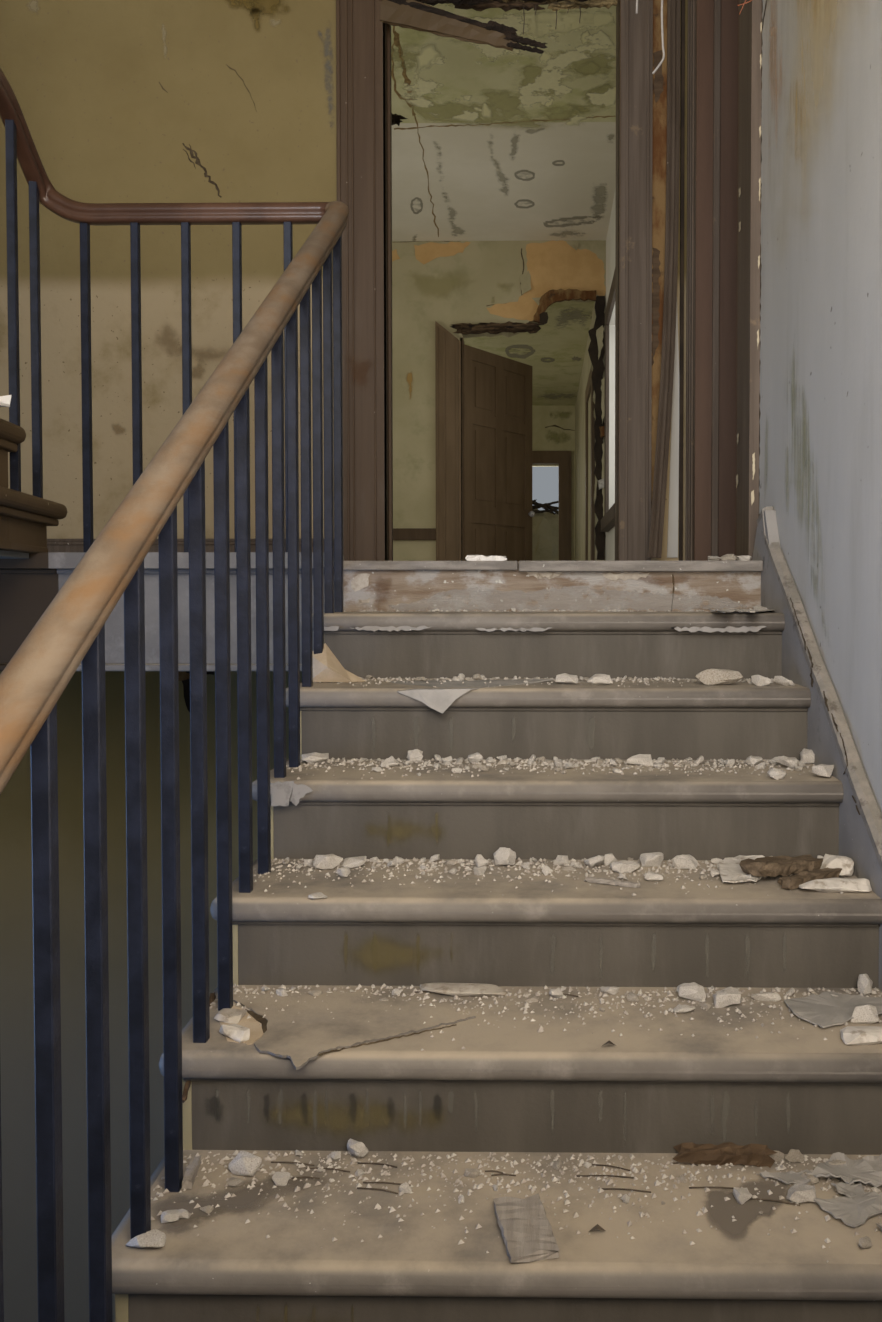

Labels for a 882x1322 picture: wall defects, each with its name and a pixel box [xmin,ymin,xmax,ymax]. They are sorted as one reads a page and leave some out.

damp [228,0,288,30]
peeling [402,45,491,122]
peeling [416,0,617,125]
crack [182,143,222,198]
crack [391,26,616,242]
flaking render [392,242,470,264]
flaking render [487,240,606,325]